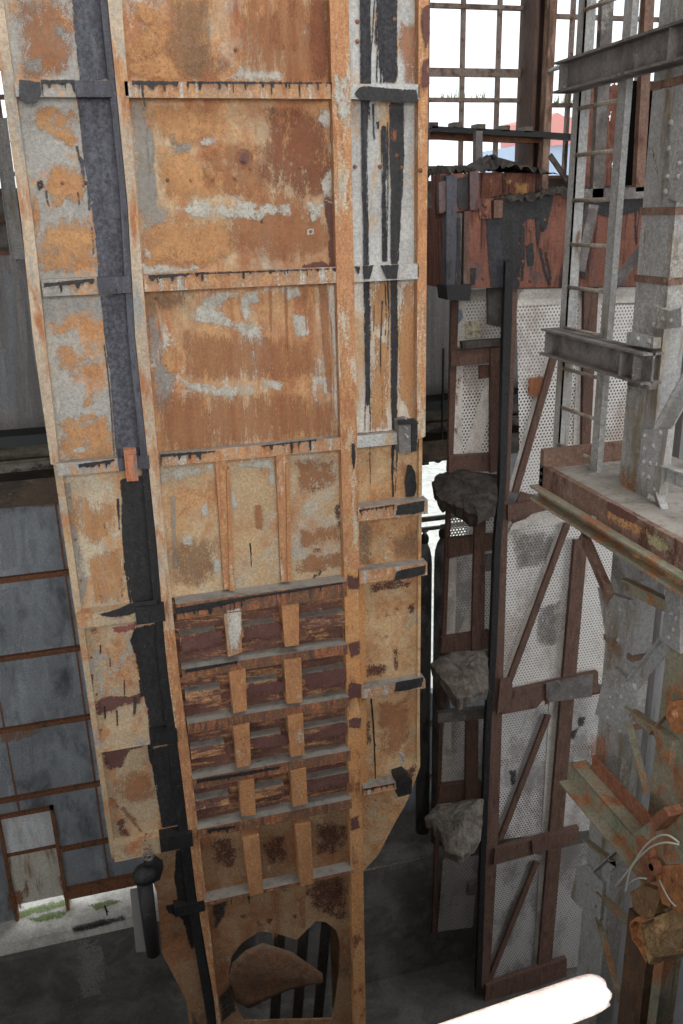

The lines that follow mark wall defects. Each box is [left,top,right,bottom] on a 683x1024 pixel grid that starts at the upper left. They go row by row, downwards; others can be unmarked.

corrosion [128,1,188,80]
corrosion [237,0,352,128]
corrosion [34,106,78,147]
corrosion [142,105,345,268]
corrosion [32,164,99,273]
peeling [185,290,267,348]
peeling [280,286,301,300]
peeling [292,314,309,338]
corrosion [158,283,334,450]
corrosion [295,460,336,494]
corrosion [606,502,648,534]
corrosion [296,525,341,573]